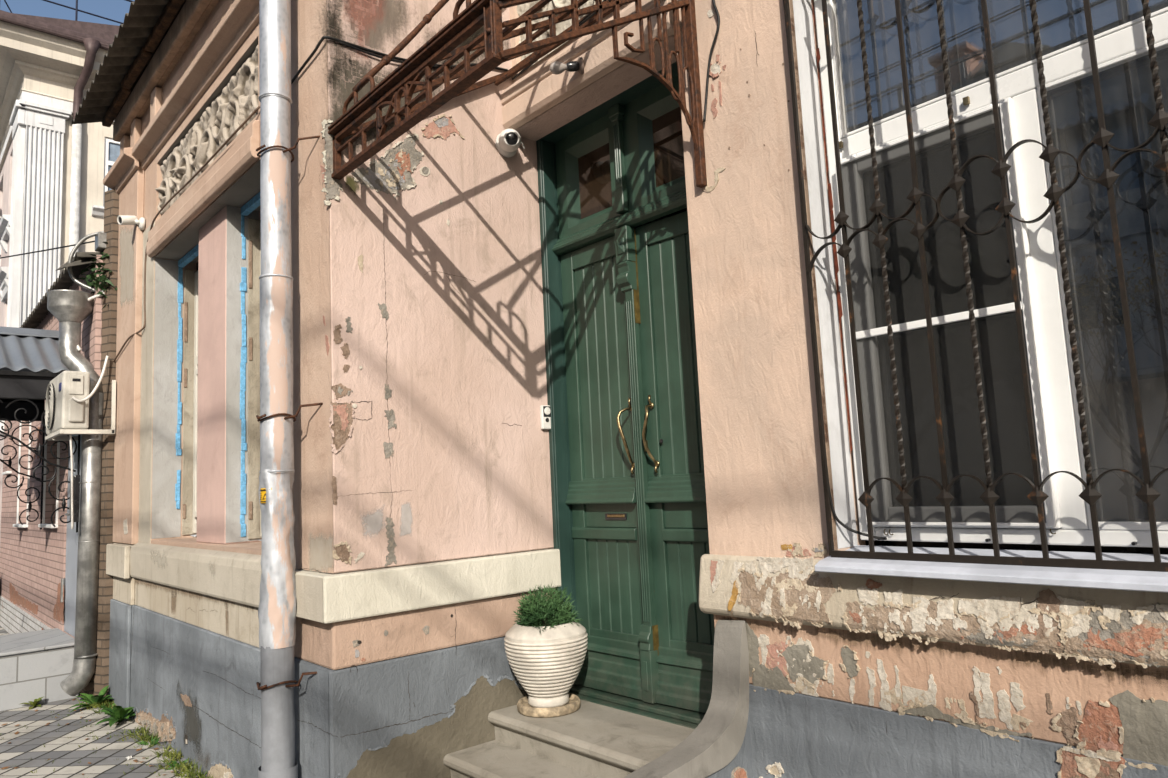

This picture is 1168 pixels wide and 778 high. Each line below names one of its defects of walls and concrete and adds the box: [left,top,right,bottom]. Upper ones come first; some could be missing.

water stain [321,0,406,82]
water stain [424,25,485,77]
peeling [321,114,464,206]
peeling [323,316,372,454]
peeling [710,543,1168,742]
flaking render [135,708,187,749]
flaking render [206,761,235,778]
peeling [448,674,524,718]
flaking render [1046,693,1157,778]